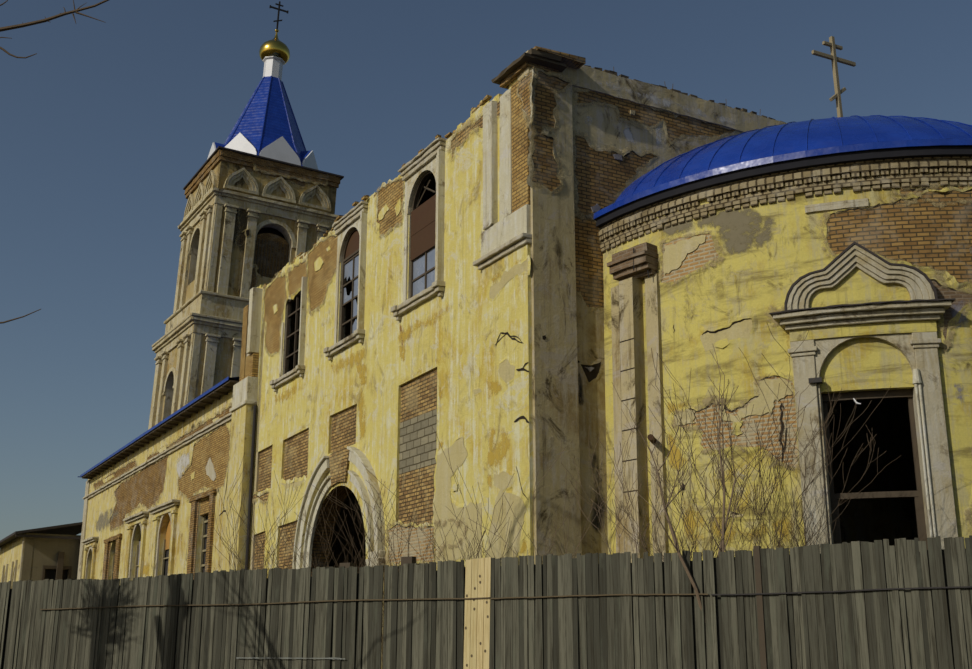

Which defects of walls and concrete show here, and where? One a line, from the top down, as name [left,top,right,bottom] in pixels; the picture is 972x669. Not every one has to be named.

peeling [448,114,483,160]
peeling [496,67,737,314]
flaking render [488,255,531,301]
peeling [820,183,972,351]
peeling [93,403,232,533]
peeling [668,368,800,474]